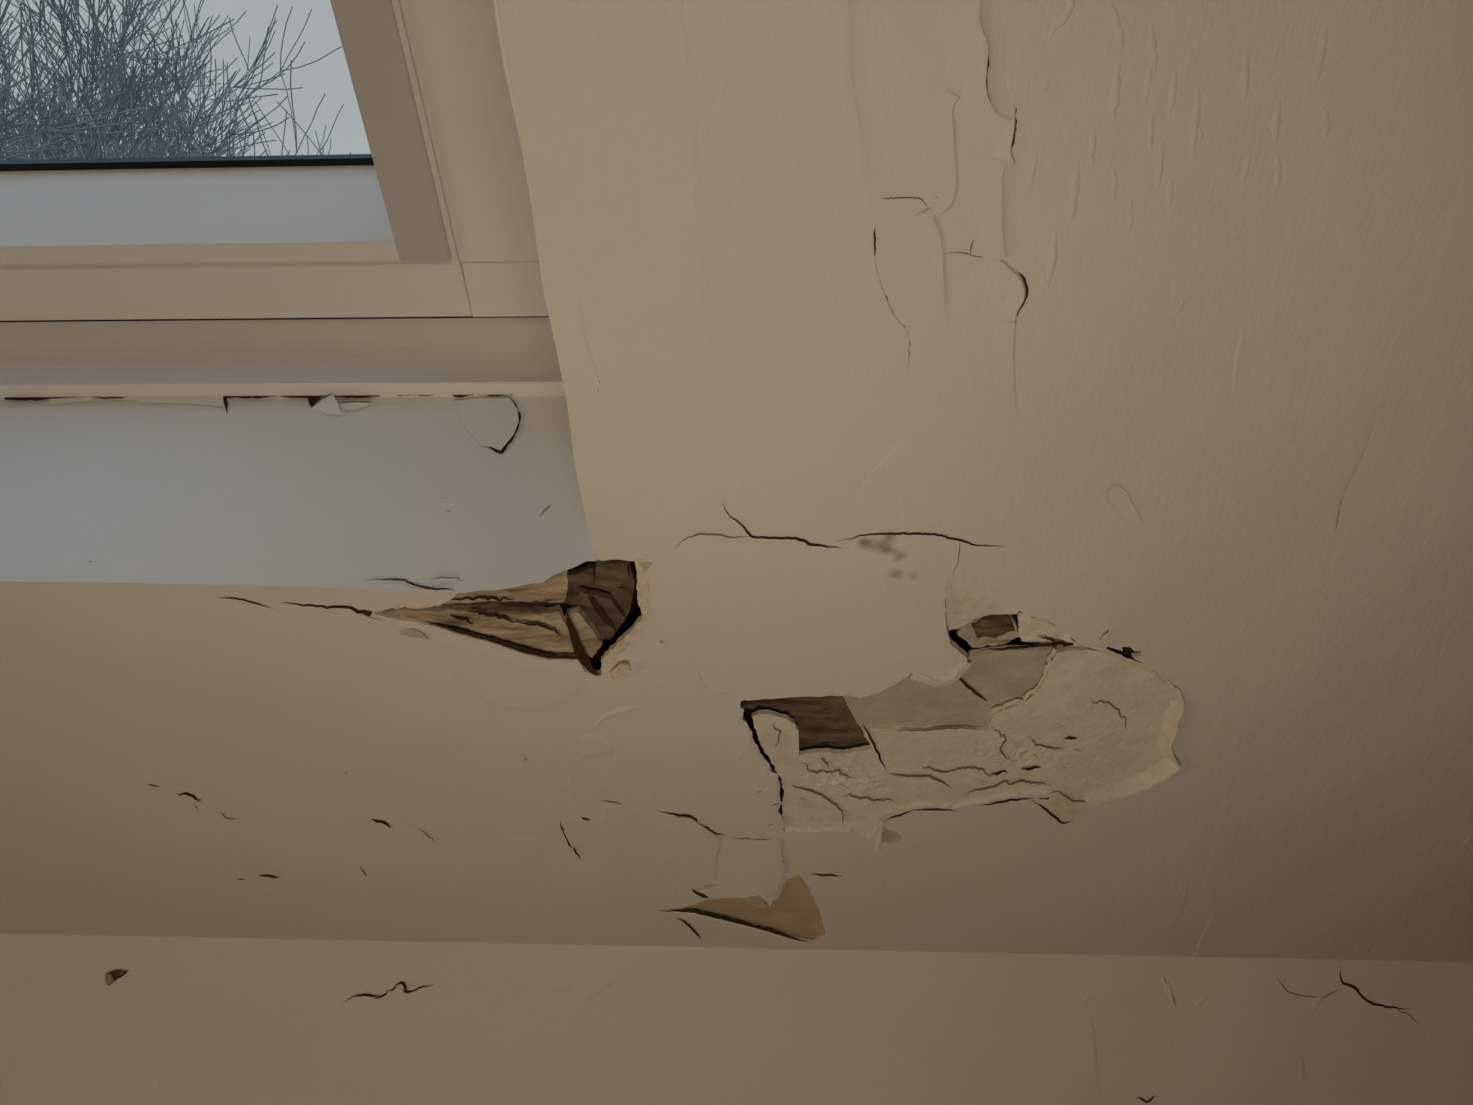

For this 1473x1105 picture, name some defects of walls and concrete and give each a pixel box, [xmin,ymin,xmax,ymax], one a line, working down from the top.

peeling [0,394,380,415]
crack [675,501,1009,578]
crack [217,576,461,626]
spalling [383,559,653,680]
spalling [699,581,1185,853]
spalling [651,873,840,950]
crack [337,981,438,1021]
crack [1278,963,1420,1025]